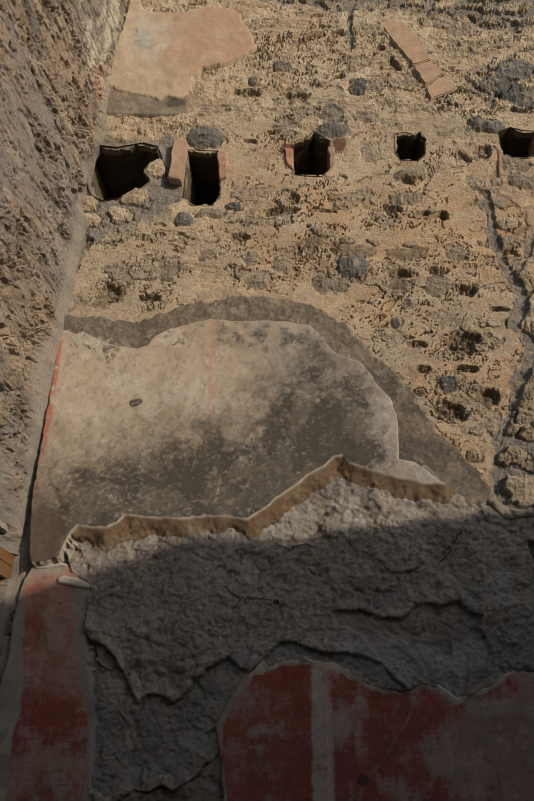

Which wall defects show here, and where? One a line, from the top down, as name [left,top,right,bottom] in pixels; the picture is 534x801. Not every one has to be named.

spalling [445,329,488,354]
spalling [472,383,504,408]
crack [223,586,272,608]
flaking render [265,632,401,686]
flaking render [92,752,222,801]